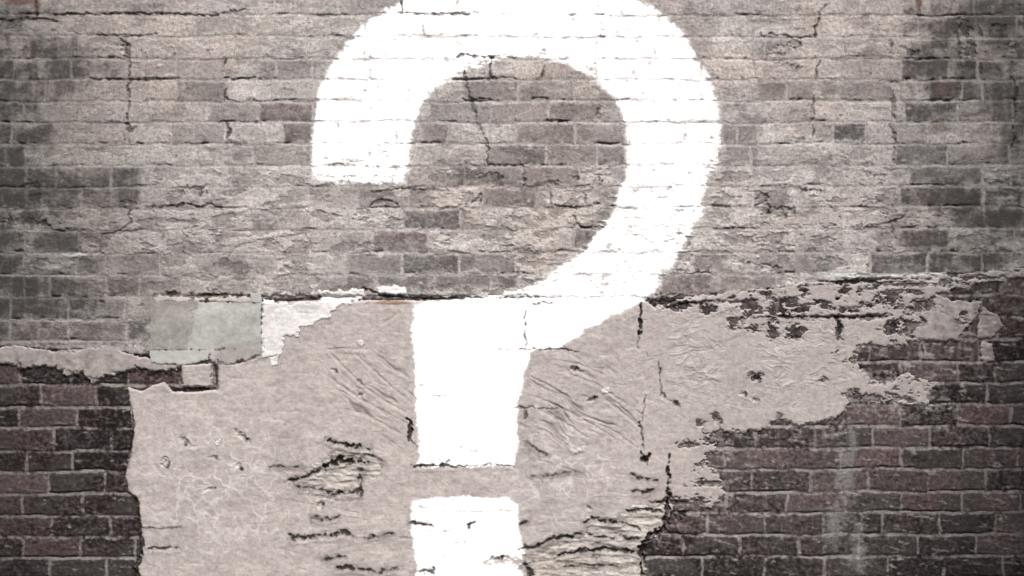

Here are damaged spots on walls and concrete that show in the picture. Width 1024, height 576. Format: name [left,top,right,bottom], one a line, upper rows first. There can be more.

crack [95,12,218,132]
crack [637,299,712,347]
crack [740,315,881,340]
flaking render [977,307,1004,364]
crack [626,362,697,576]